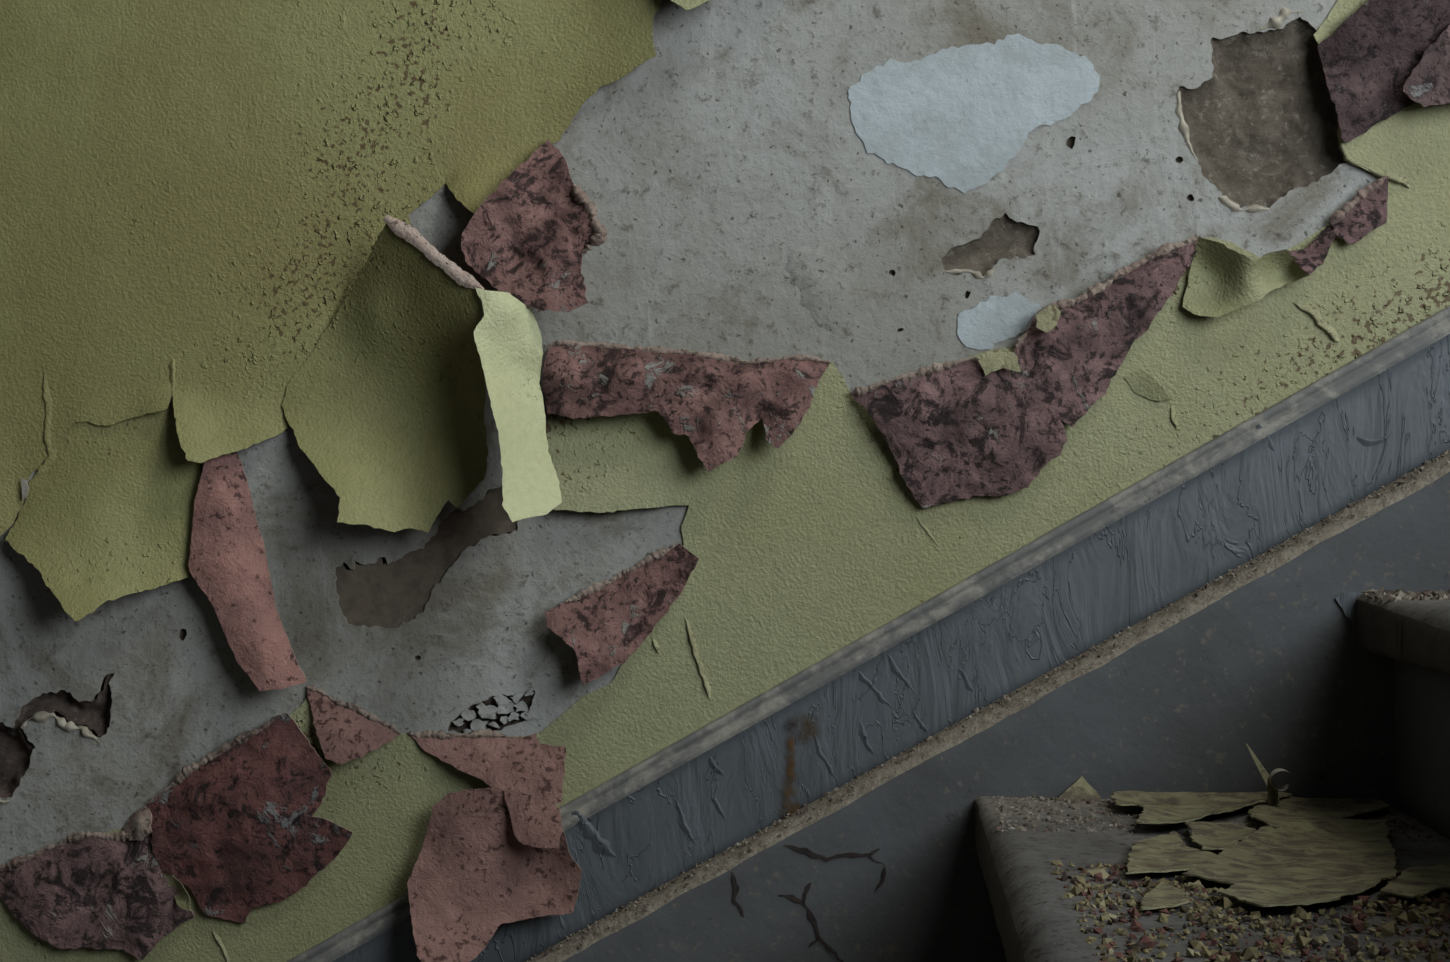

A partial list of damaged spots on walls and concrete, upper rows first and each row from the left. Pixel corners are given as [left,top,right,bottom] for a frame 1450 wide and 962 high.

peeling [671,0,709,11]
peeling [848,34,1100,193]
flaking render [1175,0,1450,213]
peeling [282,138,831,628]
peeling [849,175,1388,508]
peeling [0,400,582,962]
peeling [544,542,699,686]
crack [731,872,744,918]
crack [779,844,886,962]